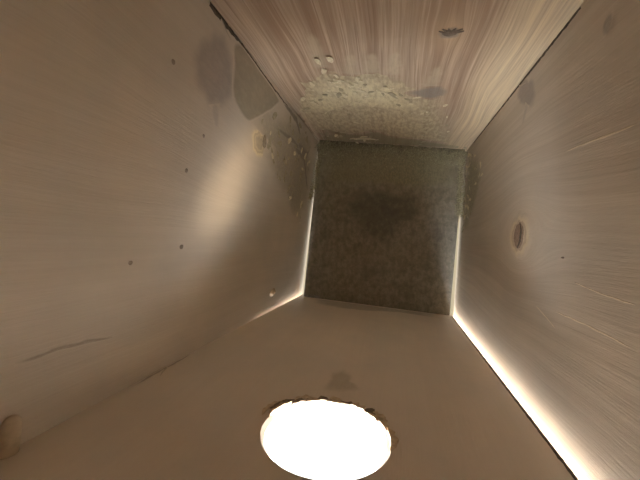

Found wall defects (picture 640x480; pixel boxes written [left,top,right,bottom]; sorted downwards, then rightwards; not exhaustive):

leakage [189,25,465,230]
leakage [331,182,433,252]
crack [14,337,113,366]